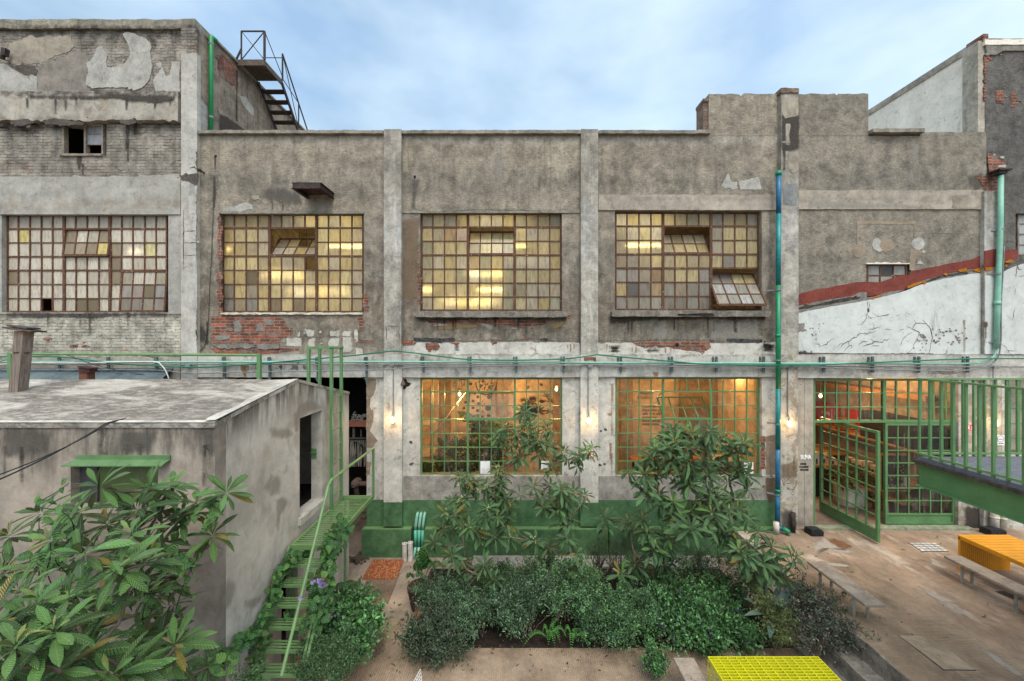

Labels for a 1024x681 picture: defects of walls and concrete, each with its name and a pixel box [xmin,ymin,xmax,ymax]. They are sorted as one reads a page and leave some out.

peeling [0,32,181,92]
spalling [983,45,1024,108]
spalling [10,118,84,129]
peeling [781,99,802,173]
peeling [721,174,762,190]
peeling [952,153,1006,208]
spalling [211,195,459,371]
spalling [427,319,548,345]
spalling [633,340,714,354]
crack [817,303,974,375]
peeling [366,379,379,448]